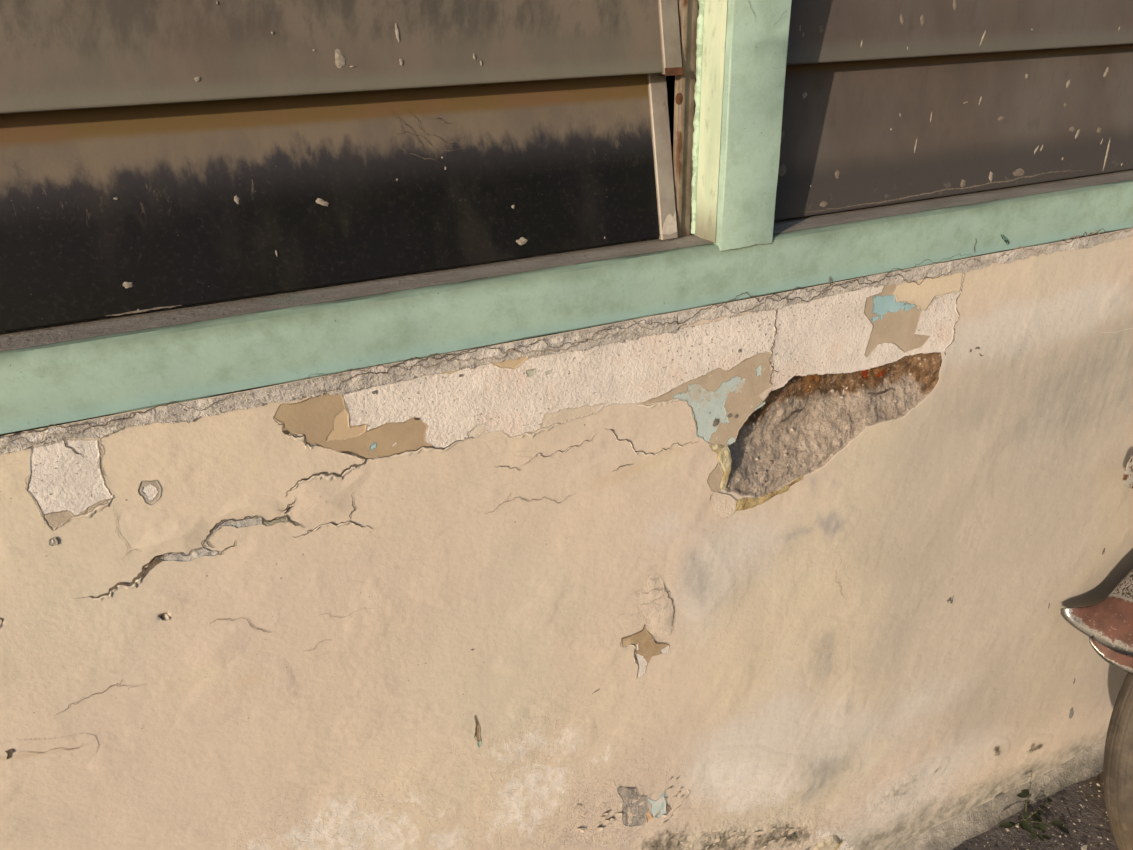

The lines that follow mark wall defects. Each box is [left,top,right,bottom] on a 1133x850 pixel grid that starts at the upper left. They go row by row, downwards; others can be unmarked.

peeling [273,272,963,511]
peeling [25,438,113,546]
crack [74,458,374,602]
crack [478,429,700,514]
peeling [620,624,669,678]
water stain [226,709,629,850]
peeling [574,778,690,833]
water stain [565,744,863,850]